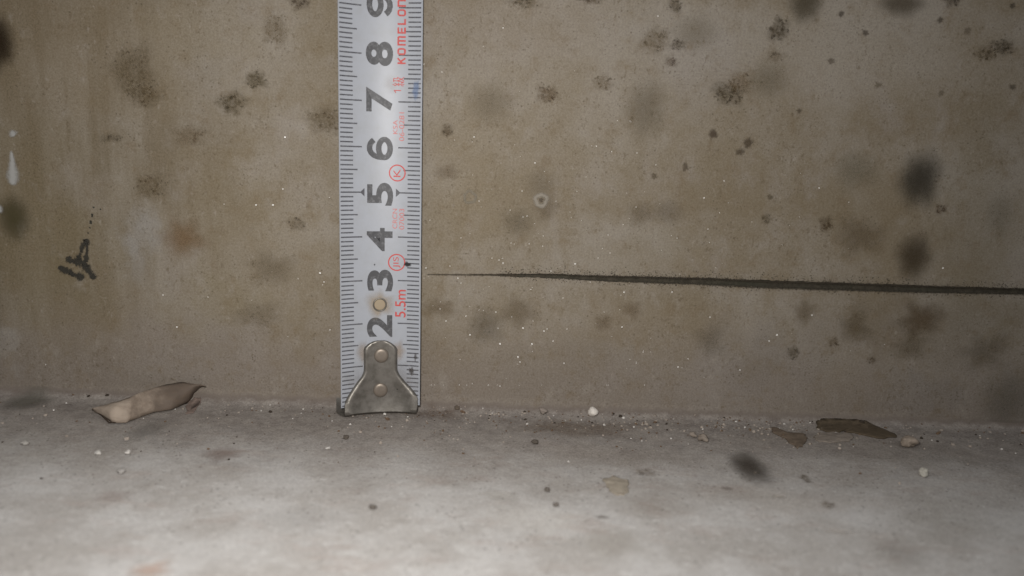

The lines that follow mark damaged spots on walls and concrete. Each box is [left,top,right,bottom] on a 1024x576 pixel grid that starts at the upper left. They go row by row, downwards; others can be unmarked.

leakage [907,165,933,195]
crack [428,265,1024,299]